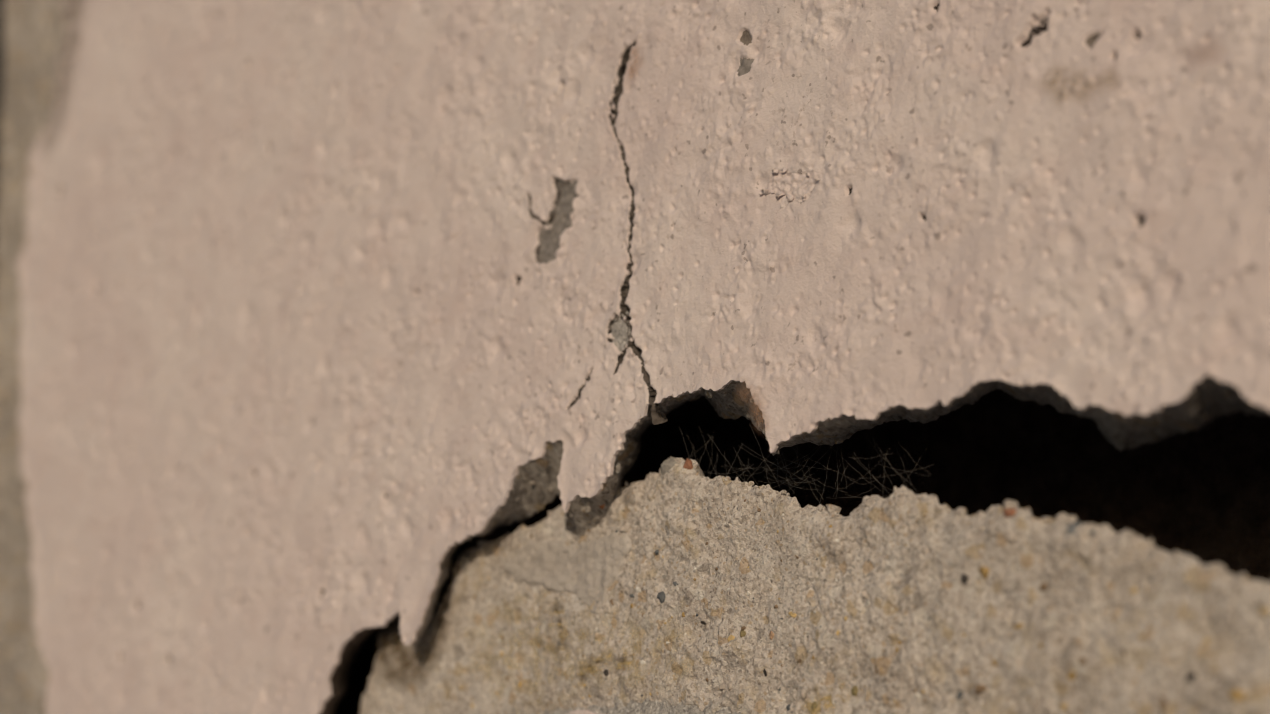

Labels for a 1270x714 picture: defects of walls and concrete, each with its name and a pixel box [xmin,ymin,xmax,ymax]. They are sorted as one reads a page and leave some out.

crack [568,42,1270,582]
crack [336,615,400,714]
crack [431,494,562,623]
flaking render [321,375,1270,714]